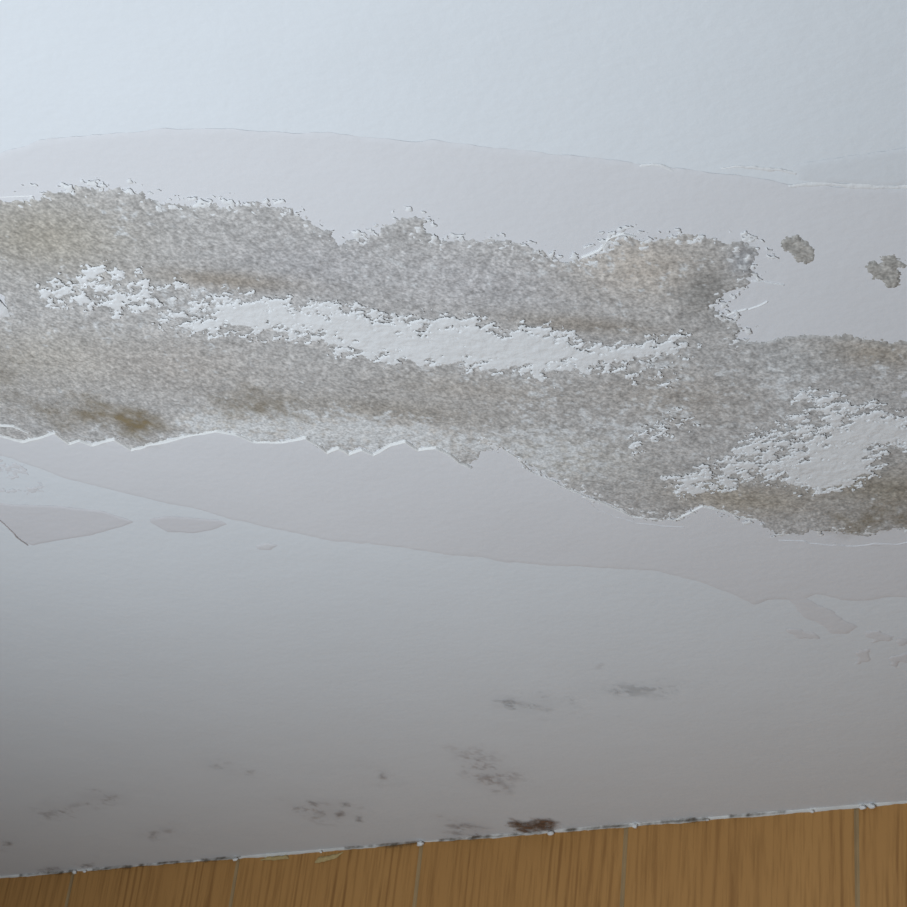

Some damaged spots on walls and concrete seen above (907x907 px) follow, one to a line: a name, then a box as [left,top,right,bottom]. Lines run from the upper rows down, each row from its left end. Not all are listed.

flaking render [0,128,907,668]